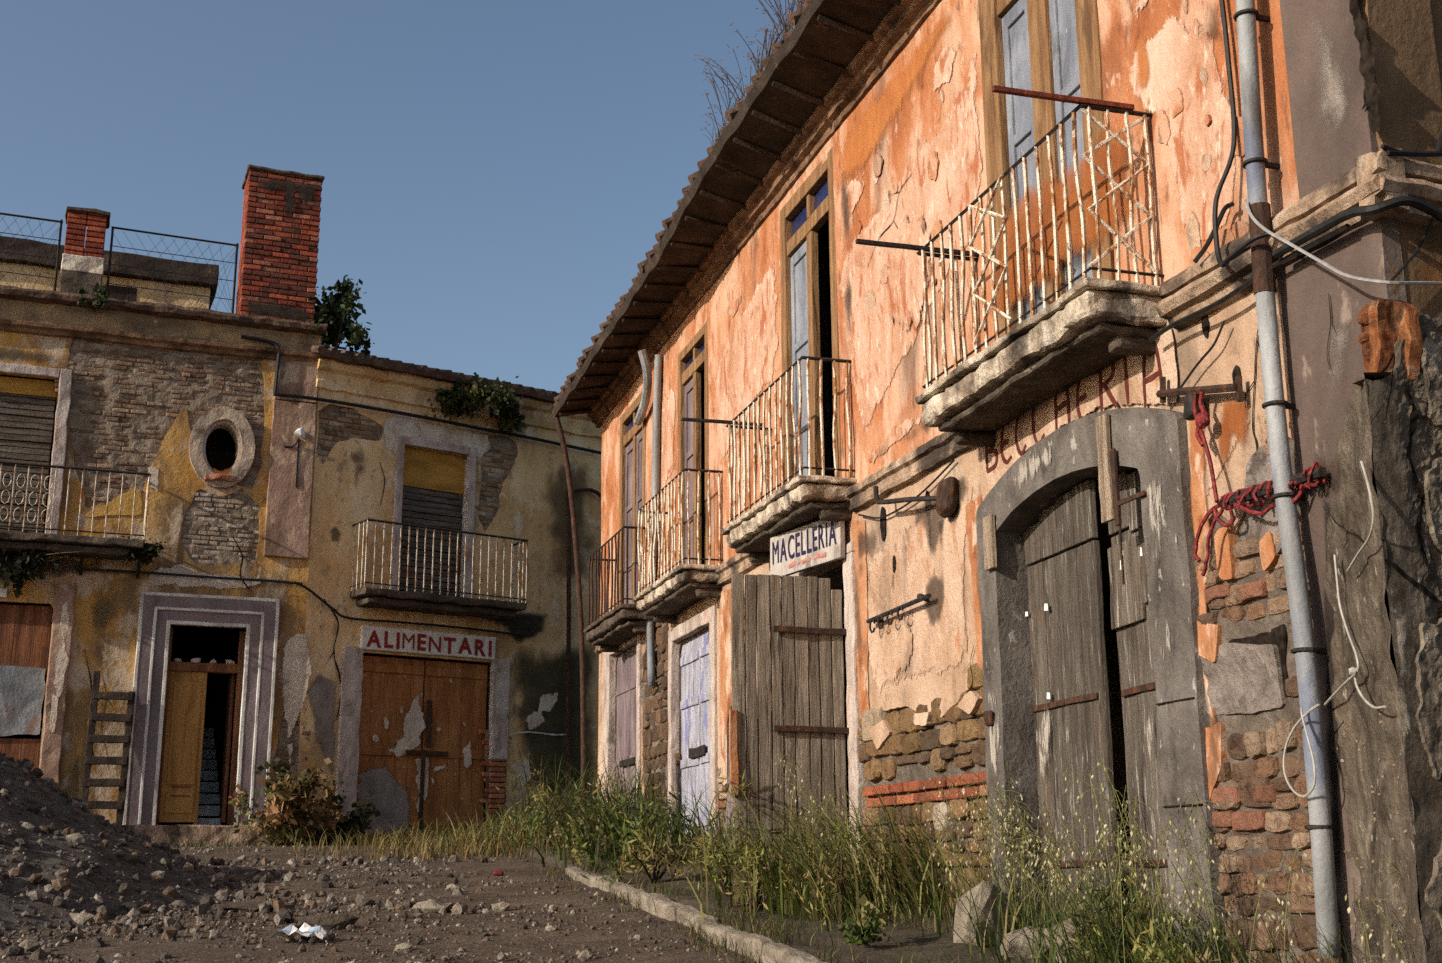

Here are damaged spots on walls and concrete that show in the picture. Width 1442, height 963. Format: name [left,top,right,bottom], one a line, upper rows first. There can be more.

crack [1349,0,1382,134]
crack [867,173,912,267]
peeling [839,46,982,427]
spalling [54,339,265,589]
spalling [314,404,518,531]
peeling [868,417,921,463]
peeling [1204,365,1249,495]
peeling [272,634,311,787]
spalling [478,729,531,815]
peeling [525,693,558,730]
spalling [857,487,999,909]
spalling [1194,437,1338,963]